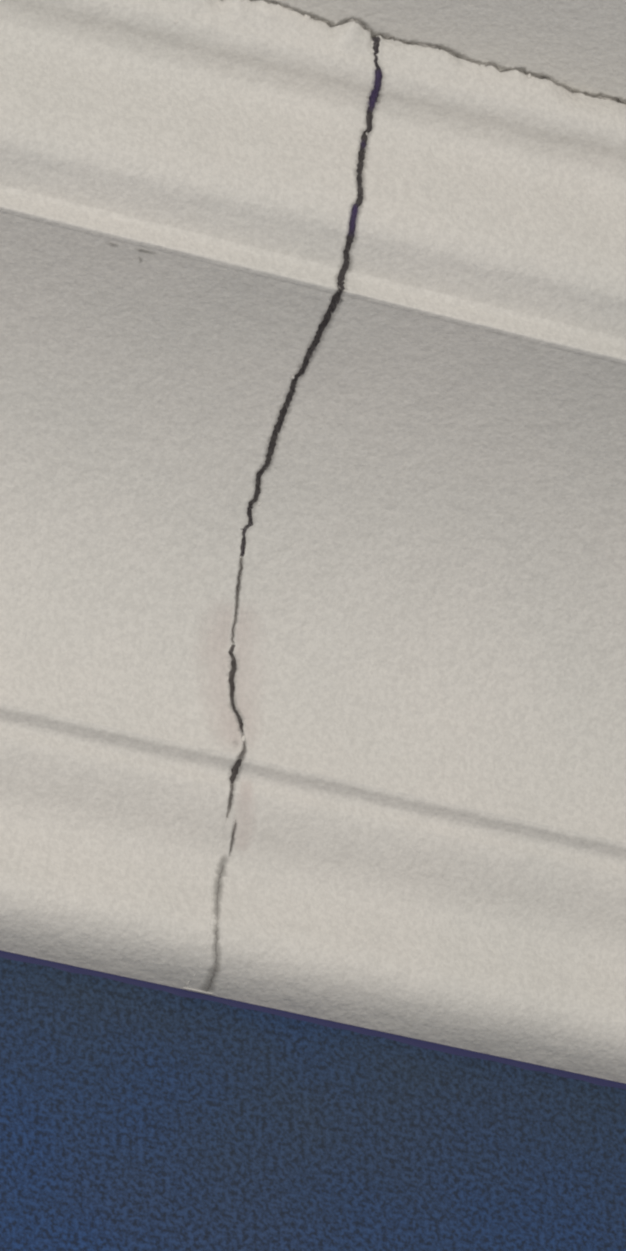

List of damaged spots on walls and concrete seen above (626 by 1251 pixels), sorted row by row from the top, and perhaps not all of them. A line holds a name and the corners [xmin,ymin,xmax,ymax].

crack [183,0,626,995]